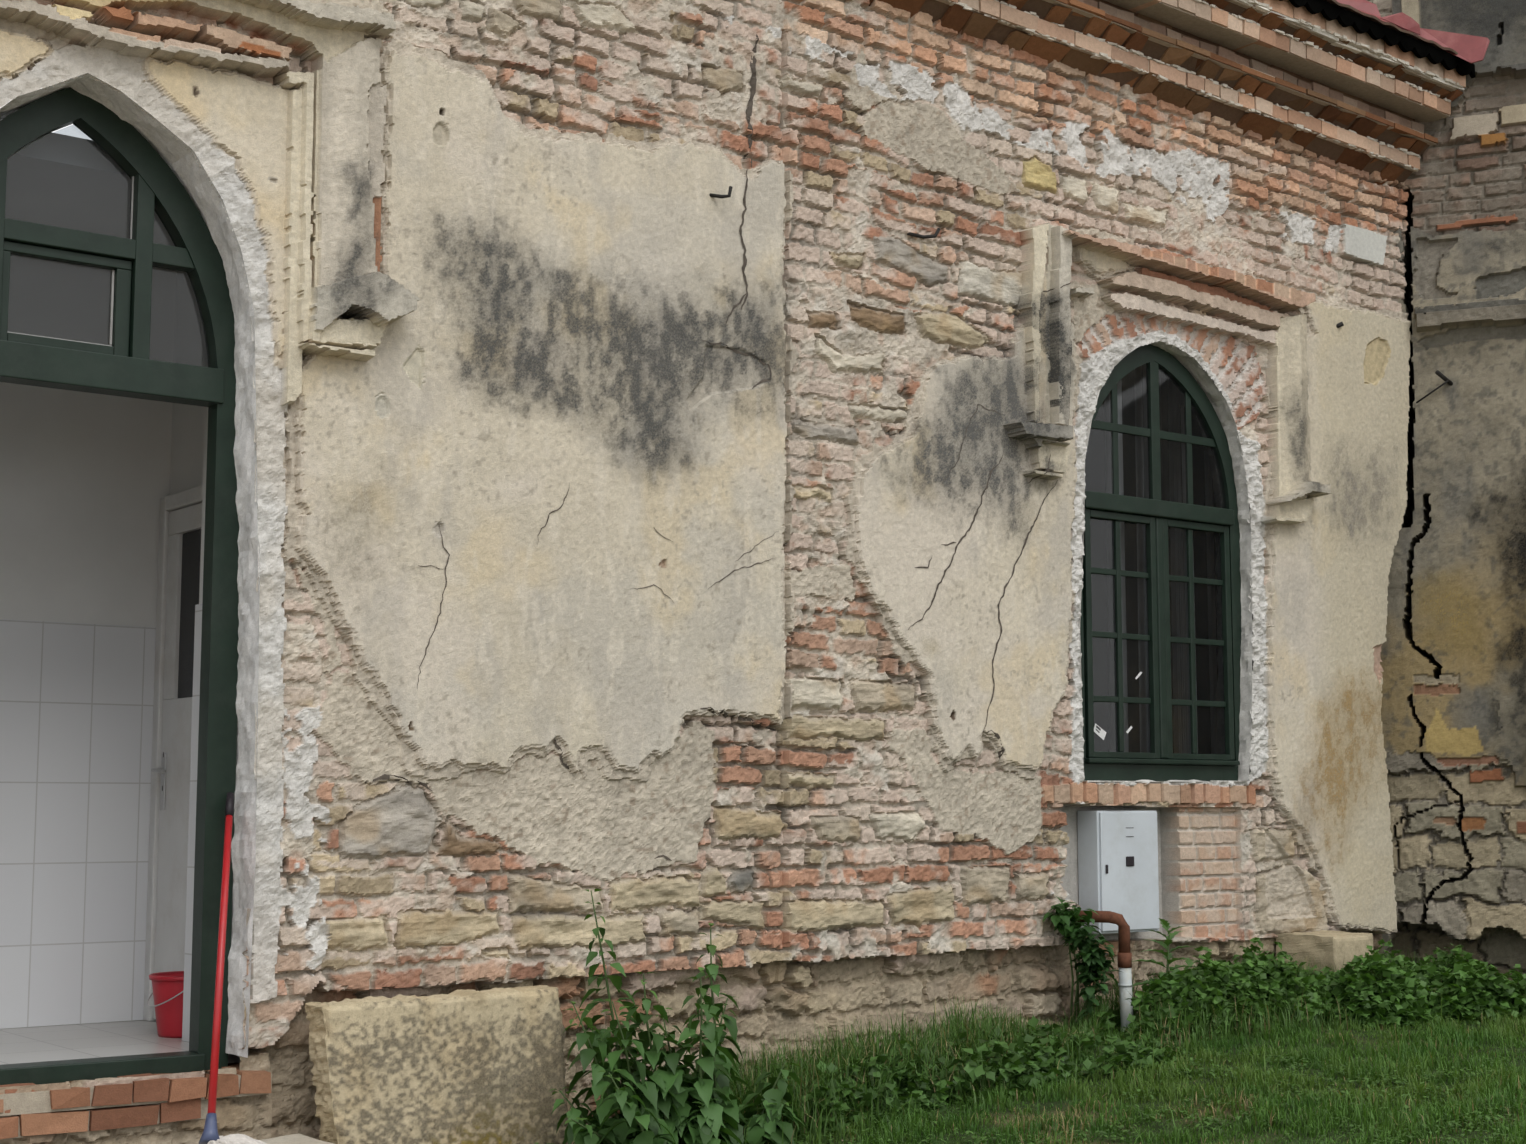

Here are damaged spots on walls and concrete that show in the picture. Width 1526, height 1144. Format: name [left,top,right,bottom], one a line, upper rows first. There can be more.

flaking render [0,0,323,287]
water stain [0,0,419,403]
water stain [438,219,786,470]
crack [702,34,772,389]
flaking render [242,0,1526,1049]
crack [908,404,1058,761]
crack [1395,186,1474,921]
water stain [1472,482,1526,702]